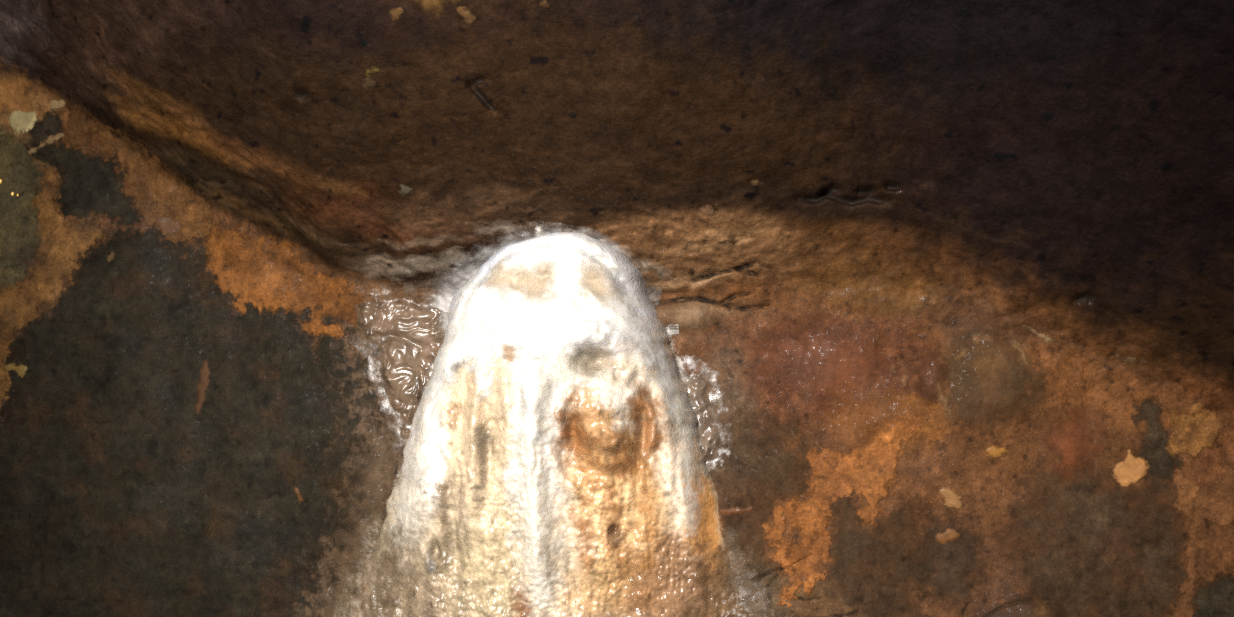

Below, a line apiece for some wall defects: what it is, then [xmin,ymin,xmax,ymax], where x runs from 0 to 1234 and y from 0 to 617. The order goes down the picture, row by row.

corrosion [0,65,30,113]
damp [325,224,767,617]